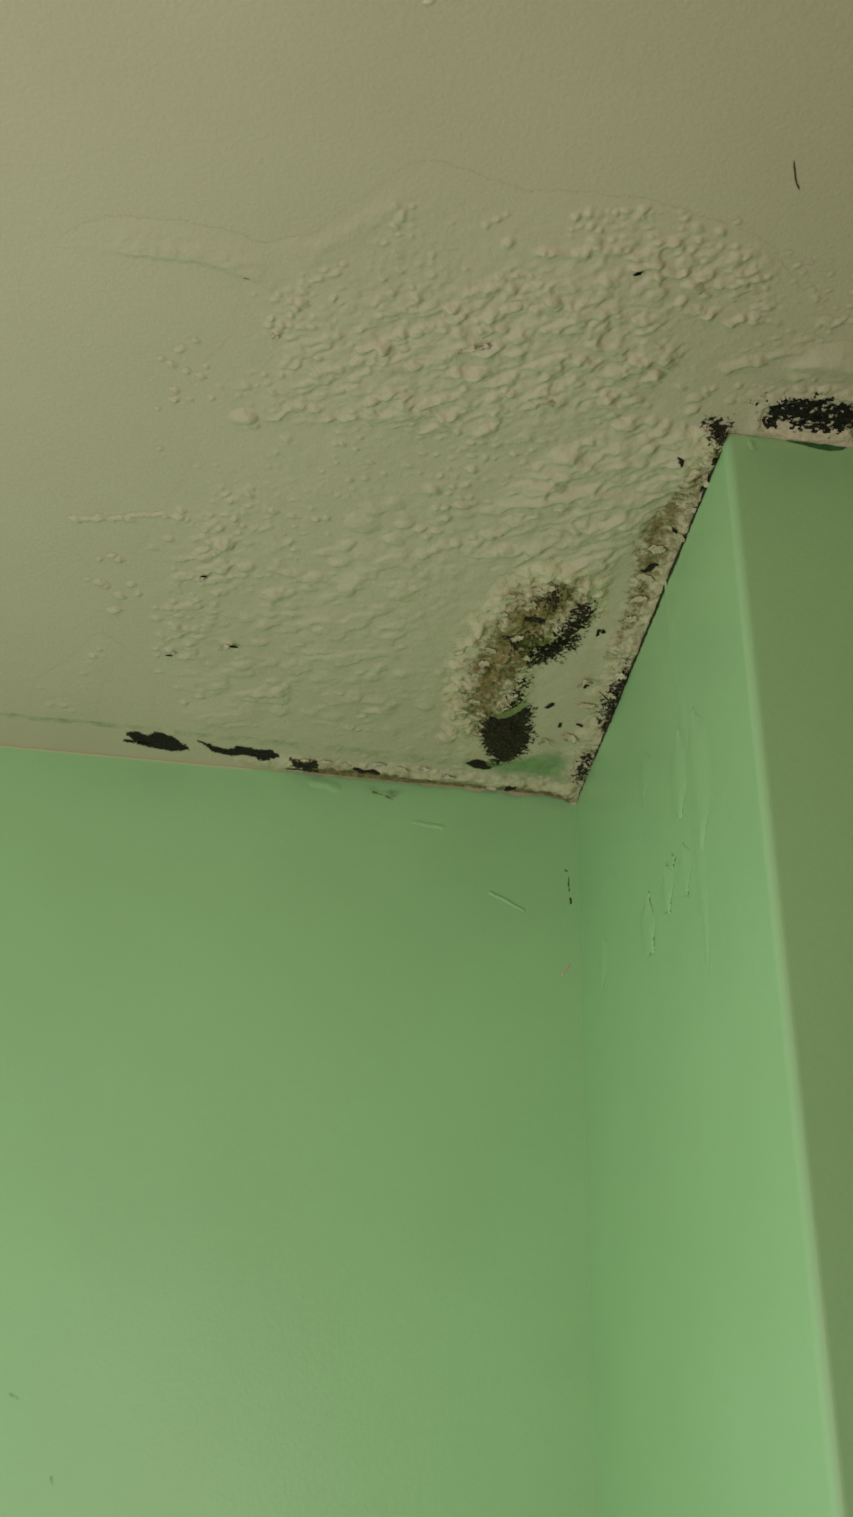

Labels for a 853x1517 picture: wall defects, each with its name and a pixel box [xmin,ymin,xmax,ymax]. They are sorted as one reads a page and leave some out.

damp [123,413,736,802]
damp [750,392,853,439]